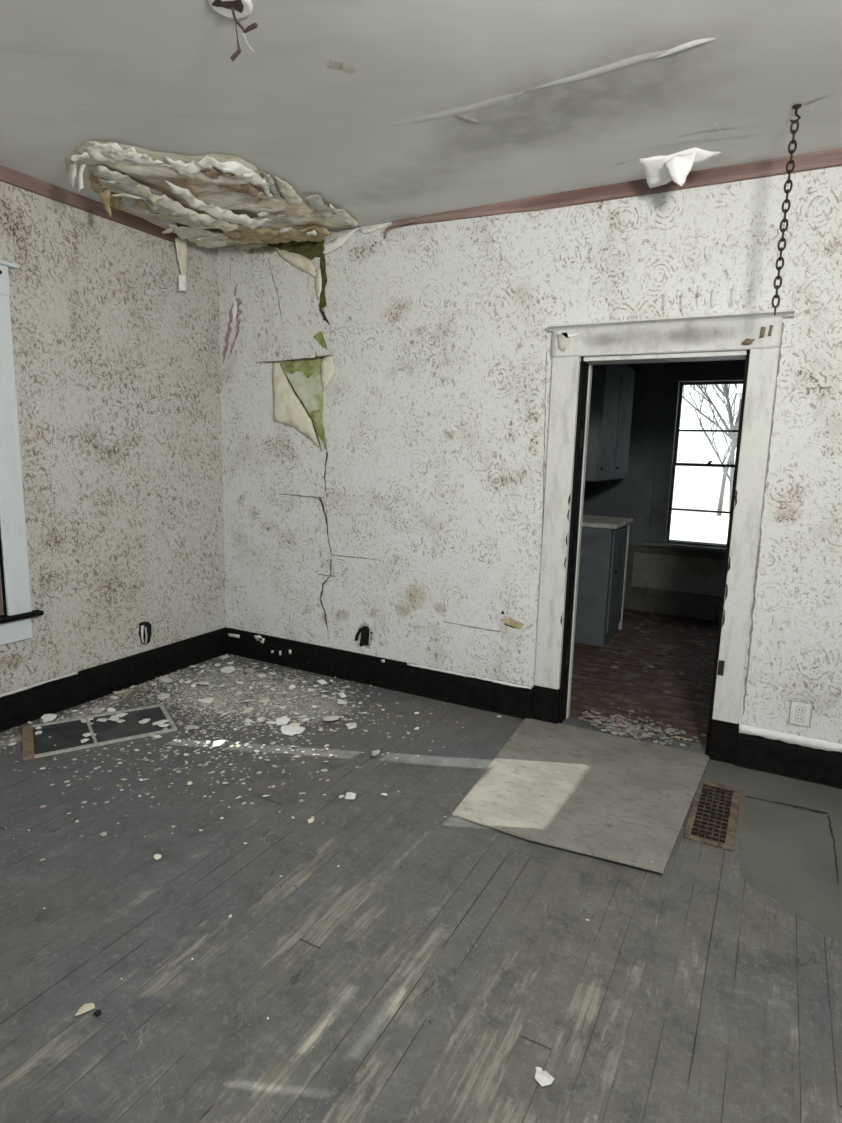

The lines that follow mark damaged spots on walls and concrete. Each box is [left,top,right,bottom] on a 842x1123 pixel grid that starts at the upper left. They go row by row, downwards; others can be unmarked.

crack [387,38,716,127]
peeling [65,140,390,363]
leakage [250,246,277,254]
crack [279,452,381,630]